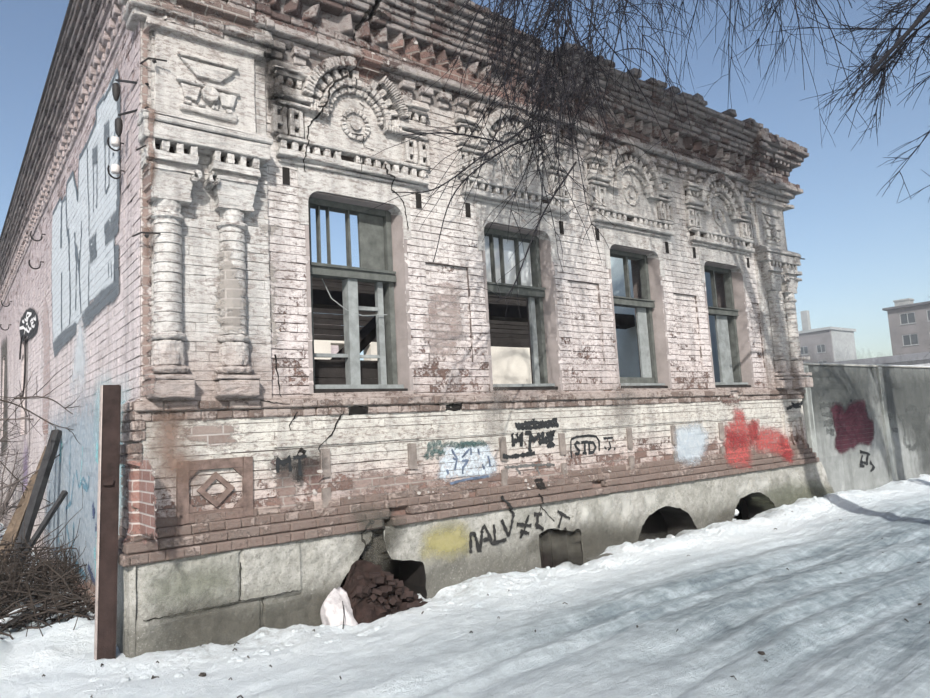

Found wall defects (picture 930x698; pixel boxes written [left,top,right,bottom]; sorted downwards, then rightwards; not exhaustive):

crack [353,0,387,41]
crack [318,411,344,453]
crack [361,519,384,558]